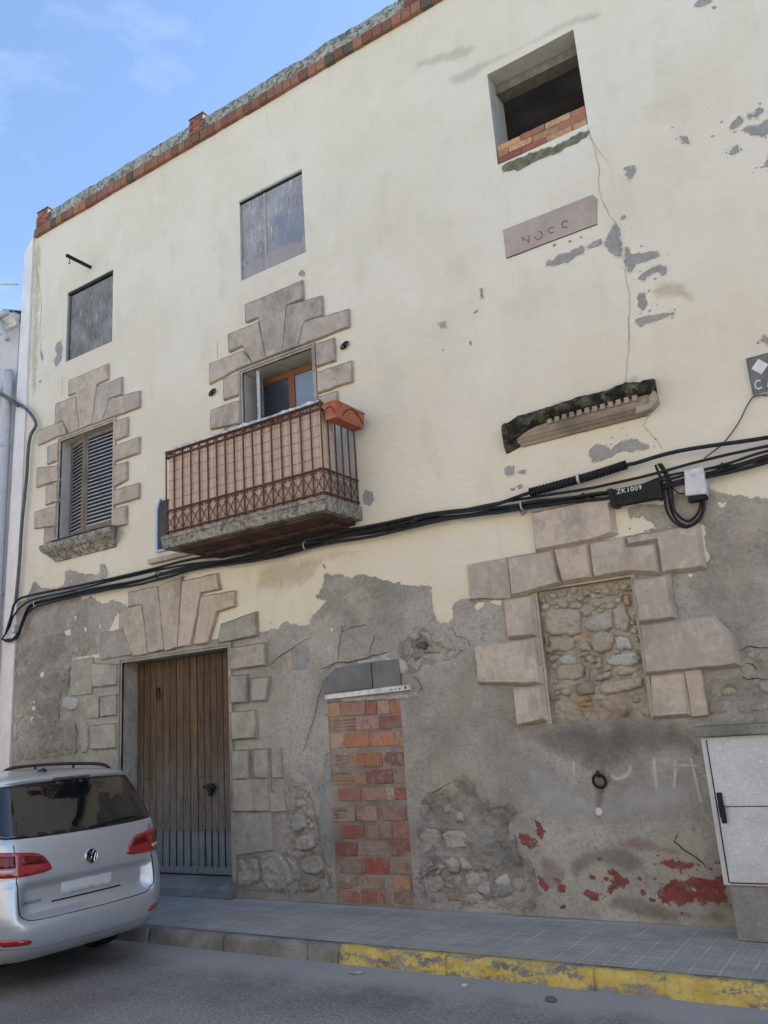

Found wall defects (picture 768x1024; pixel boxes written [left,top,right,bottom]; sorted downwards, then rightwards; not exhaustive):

peeling [711,102,768,159]
peeling [544,214,676,328]
peeling [588,428,656,464]
spalling [13,564,127,761]
crack [302,625,387,752]
peeling [264,561,463,673]
peeling [452,598,503,611]
spalling [709,648,768,714]
spalling [237,759,332,894]
spalling [416,774,570,912]
peeling [583,854,733,914]